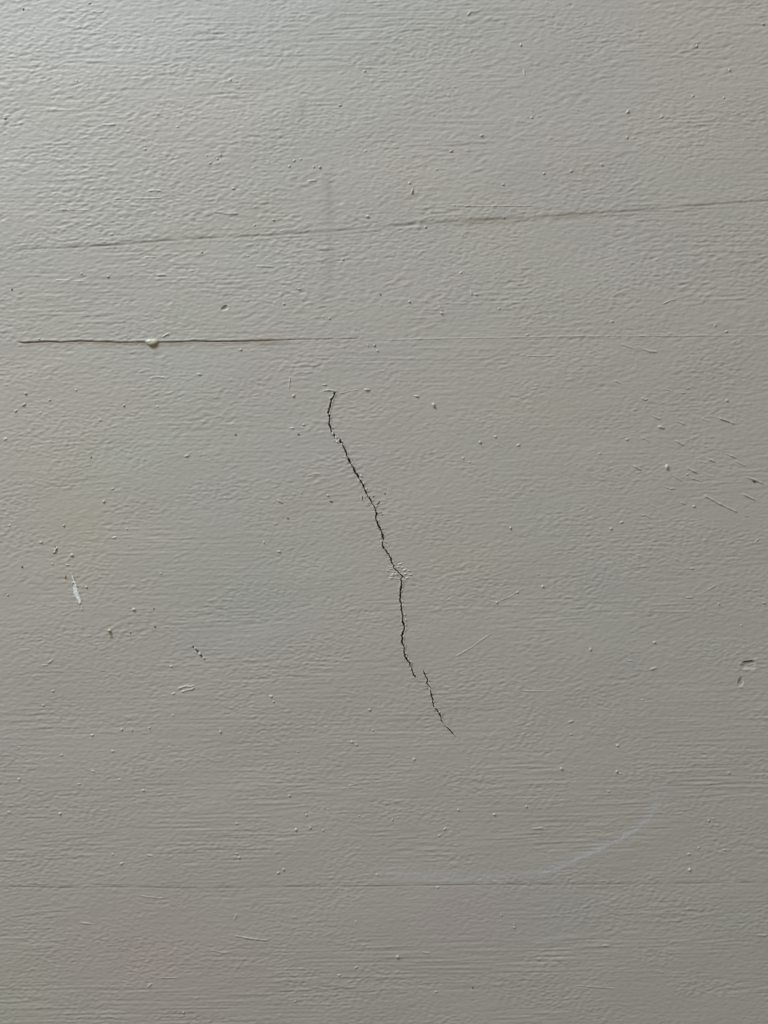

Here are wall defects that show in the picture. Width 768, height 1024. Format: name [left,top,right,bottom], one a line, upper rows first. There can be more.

crack [325,388,461,744]